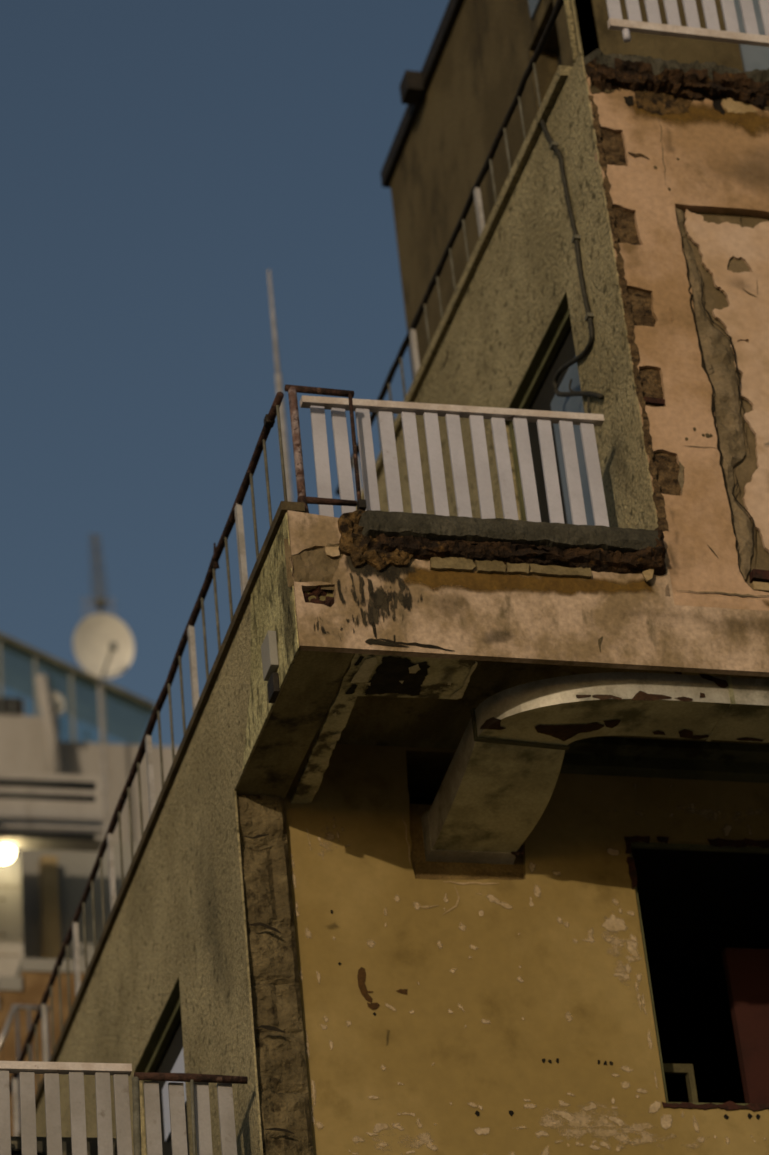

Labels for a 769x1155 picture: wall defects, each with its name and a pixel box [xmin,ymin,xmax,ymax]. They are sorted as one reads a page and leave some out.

spalling [583,49,769,581]
spalling [284,538,343,607]
peeling [430,557,592,578]
water stain [314,555,430,696]
peeling [351,657,377,686]
peeling [519,1093,636,1155]
peeling [612,1066,730,1144]